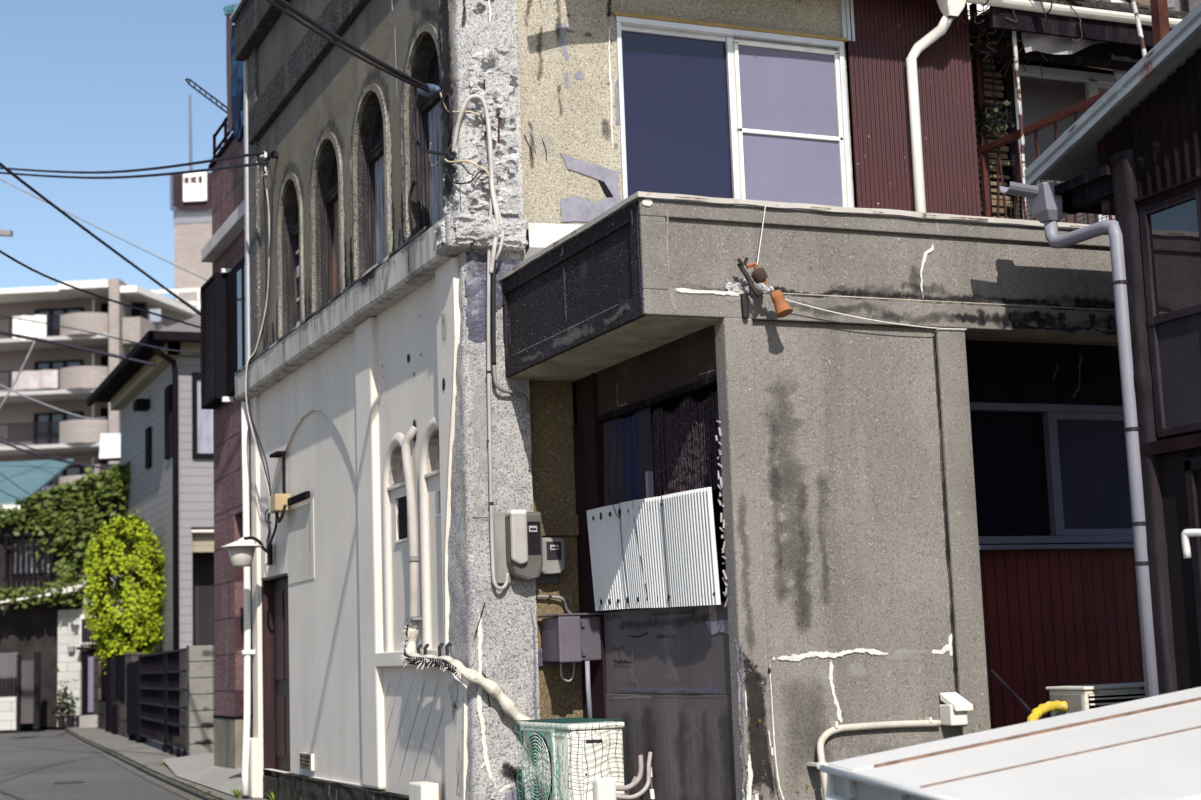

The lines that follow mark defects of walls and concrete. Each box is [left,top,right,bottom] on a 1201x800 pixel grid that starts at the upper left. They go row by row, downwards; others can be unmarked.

spalling [434,39,528,343]
damp [392,194,405,252]
damp [344,237,353,288]
damp [773,286,1117,335]
crack [932,634,953,656]
crack [768,648,888,800]